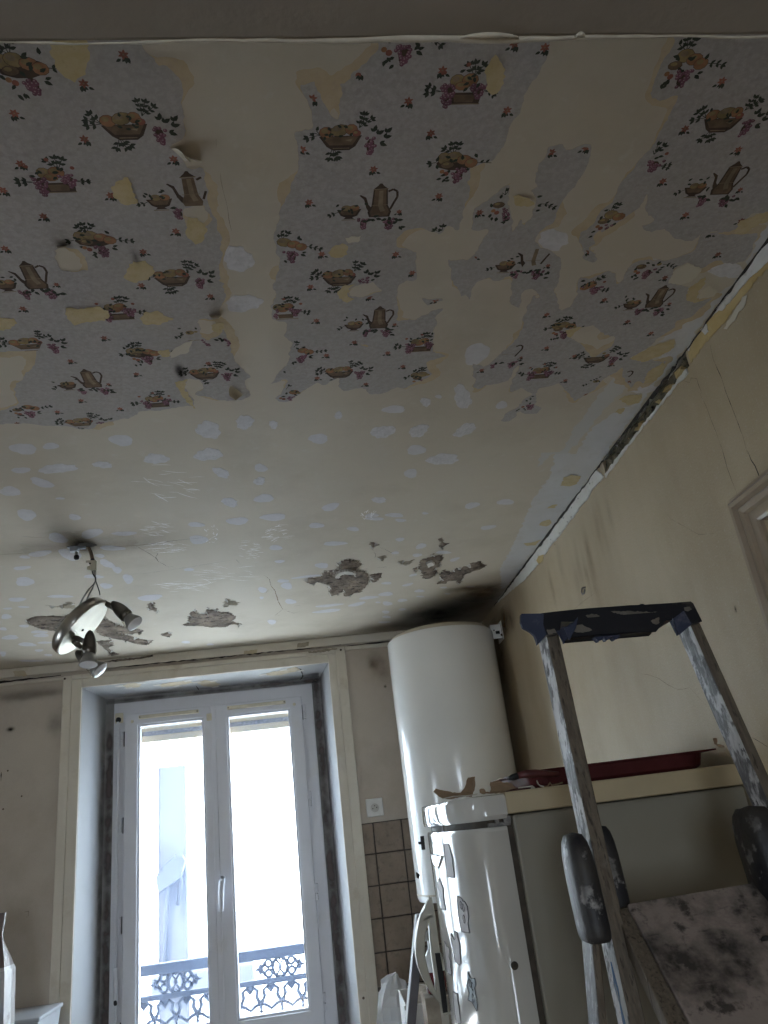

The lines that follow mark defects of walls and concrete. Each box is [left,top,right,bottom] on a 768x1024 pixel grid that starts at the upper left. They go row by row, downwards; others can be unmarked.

flaking render [714,244,768,329]
crack [678,238,768,493]
flaking render [303,538,487,597]
flaking render [25,602,76,631]
flaking render [95,616,172,662]
flaking render [183,598,242,628]